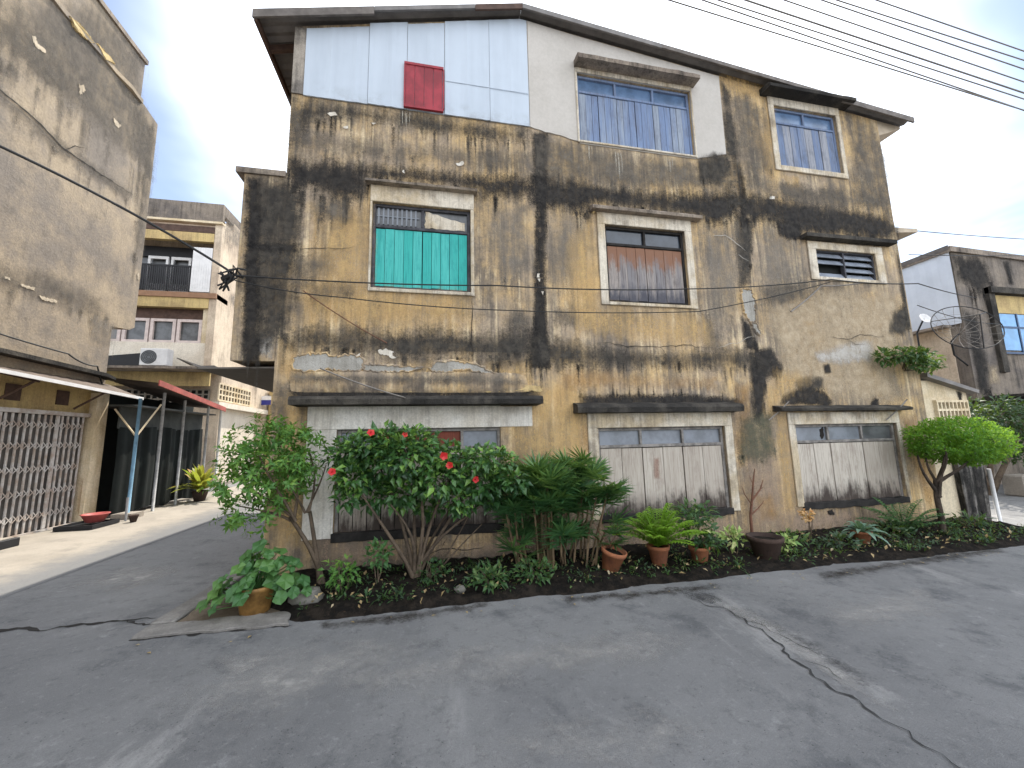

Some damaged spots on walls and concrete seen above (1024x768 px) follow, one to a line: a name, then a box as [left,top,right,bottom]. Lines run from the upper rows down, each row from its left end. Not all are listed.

peeling [281,345,497,374]
water stain [225,75,911,509]
crack [0,617,202,641]
crack [691,594,960,768]